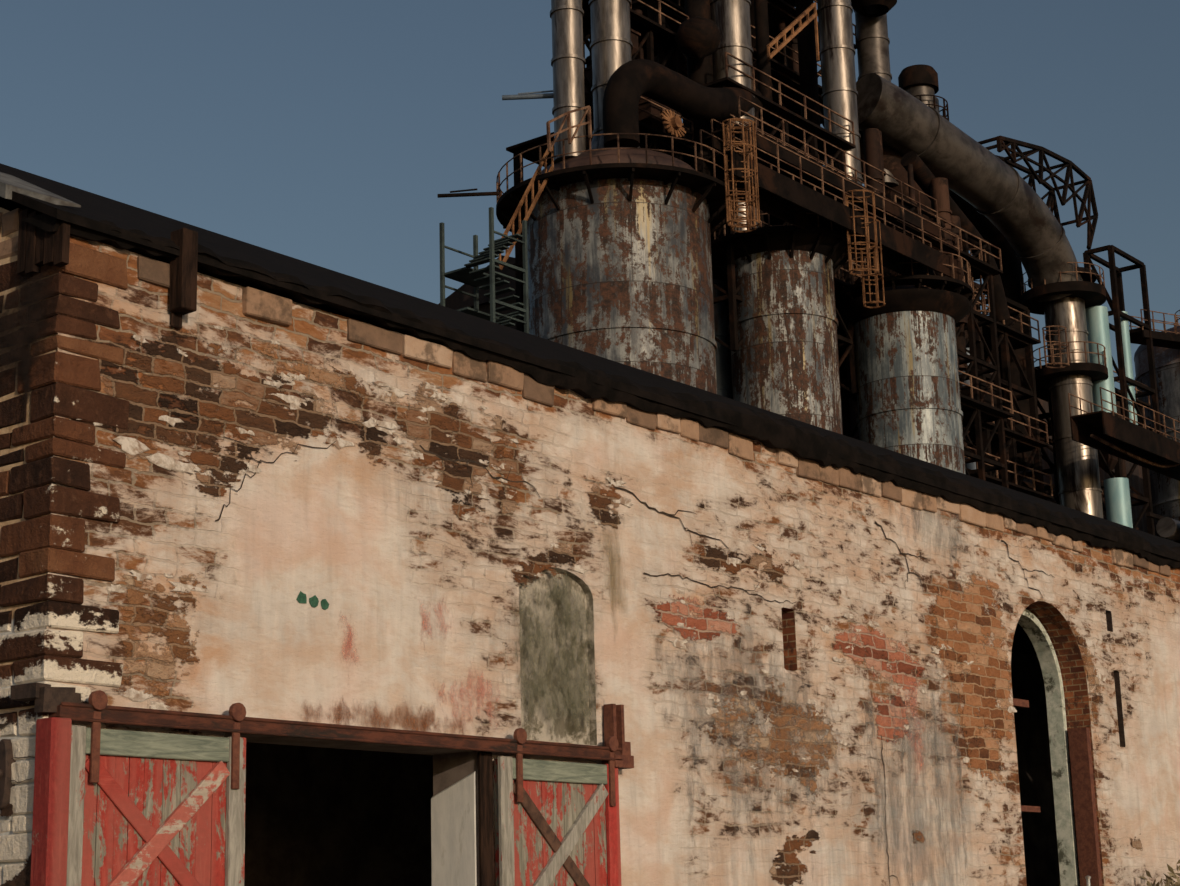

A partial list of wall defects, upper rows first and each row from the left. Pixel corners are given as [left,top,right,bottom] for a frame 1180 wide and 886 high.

spalling [76,325,531,522]
crack [215,437,336,521]
spalling [585,477,633,529]
crack [614,486,729,549]
spalling [106,570,210,710]
spalling [512,543,588,588]
damp [516,575,592,727]
peeling [654,590,738,649]
crack [644,572,796,604]
peeling [821,573,1017,786]
spalling [700,669,847,804]